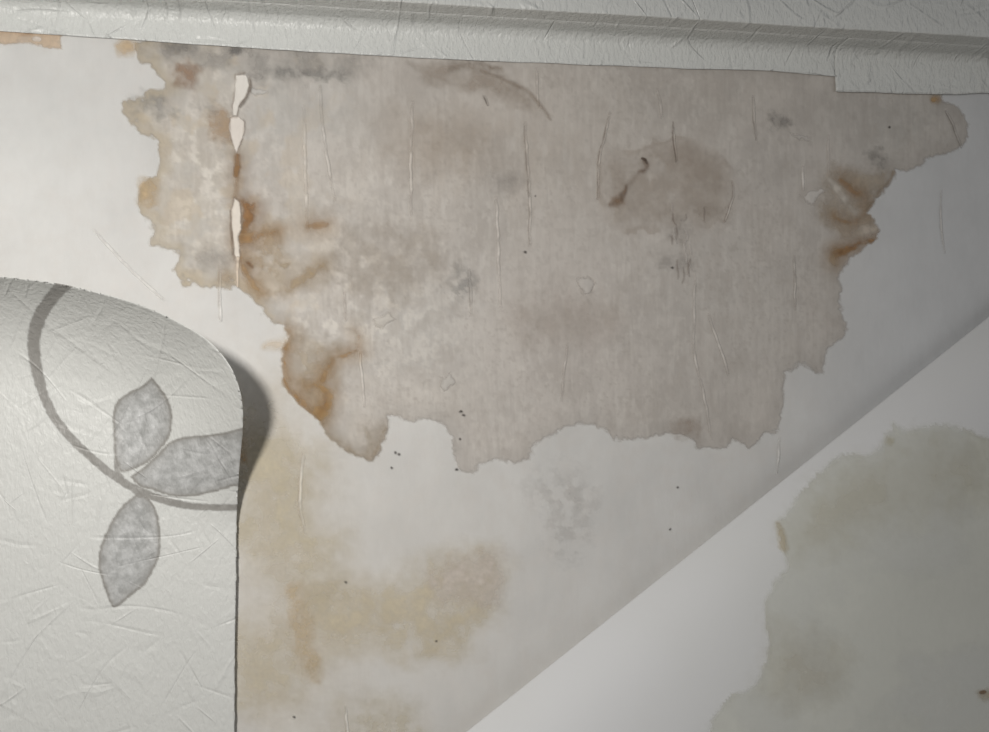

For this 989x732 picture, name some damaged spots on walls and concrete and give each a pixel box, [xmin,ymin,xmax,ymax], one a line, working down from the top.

damp [117,41,967,472]
damp [249,440,315,547]
damp [711,425,989,732]